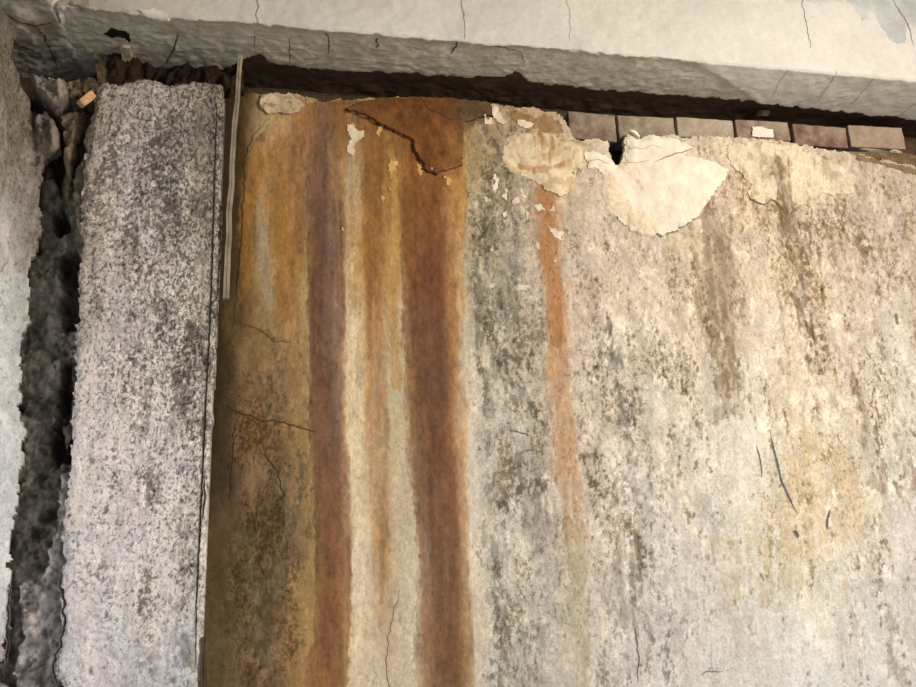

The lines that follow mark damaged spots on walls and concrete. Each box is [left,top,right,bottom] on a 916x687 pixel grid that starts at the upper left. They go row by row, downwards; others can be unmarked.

crack [166,33,179,65]
crack [893,0,914,46]
crack [0,22,100,687]
corrosion [236,99,489,687]
water stain [476,468,509,687]
water stain [463,188,525,459]
corrosion [525,179,594,687]
water stain [597,485,648,642]
peeling [472,103,862,240]
water stain [689,198,746,426]
water stain [766,154,825,379]
water stain [709,368,916,609]